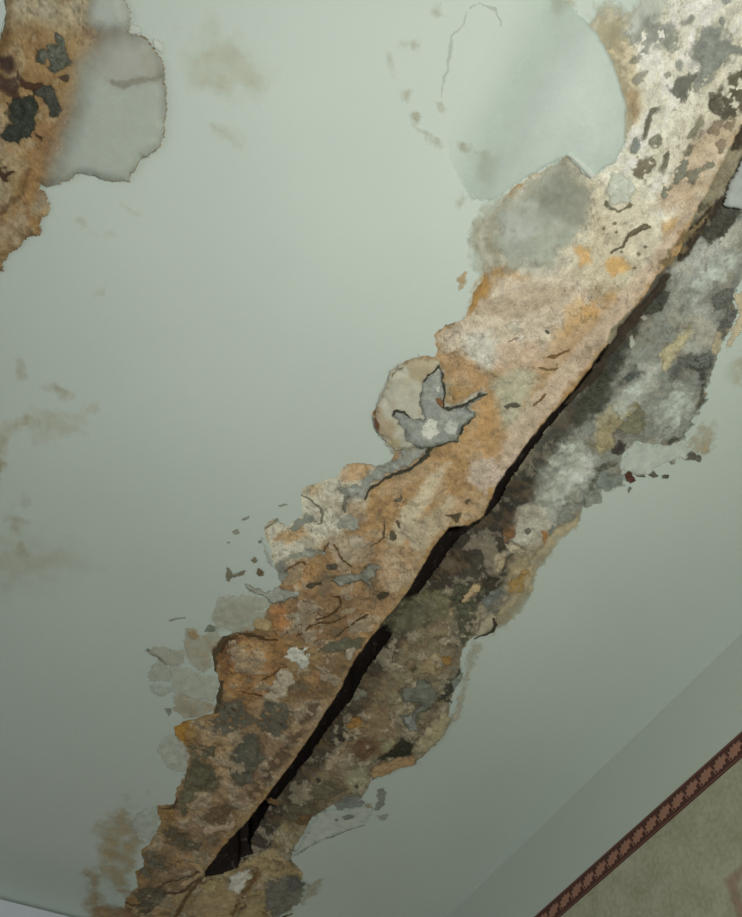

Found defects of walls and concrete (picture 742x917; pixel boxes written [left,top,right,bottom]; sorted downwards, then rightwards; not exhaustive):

flaking render [0,0,168,272]
crack [163,196,724,917]
flaking render [177,141,742,917]